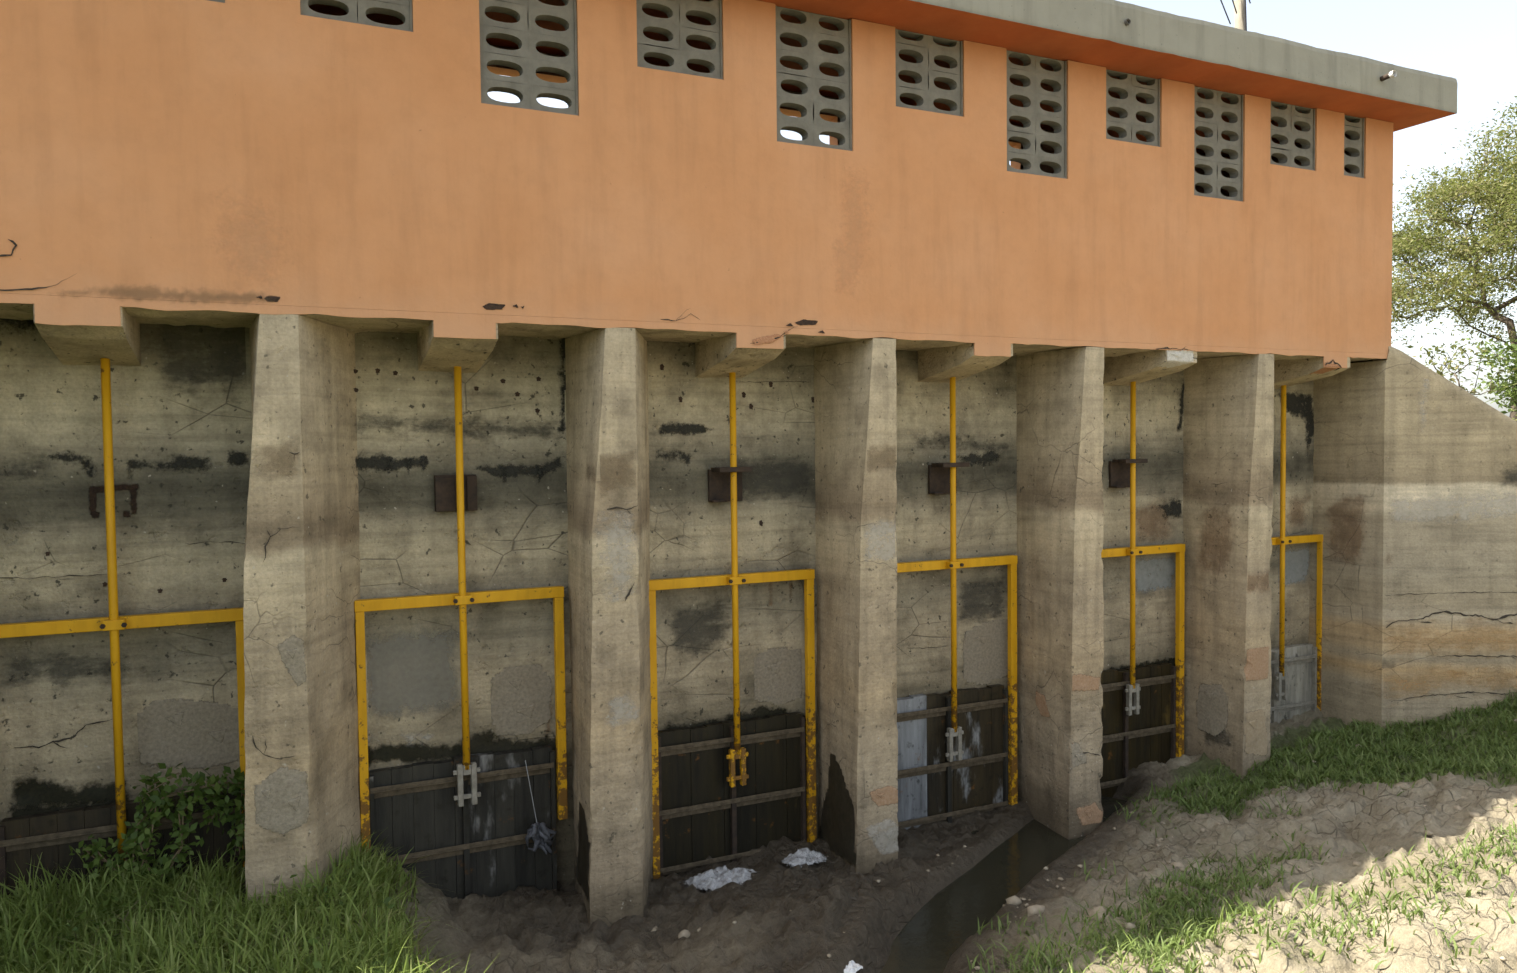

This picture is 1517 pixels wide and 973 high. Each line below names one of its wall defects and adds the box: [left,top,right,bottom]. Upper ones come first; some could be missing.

crack [0,239,77,291]
water stain [359,338,566,438]
water stain [355,454,429,473]
water stain [477,457,561,482]
crack [1386,591,1517,702]
crack [14,719,112,748]